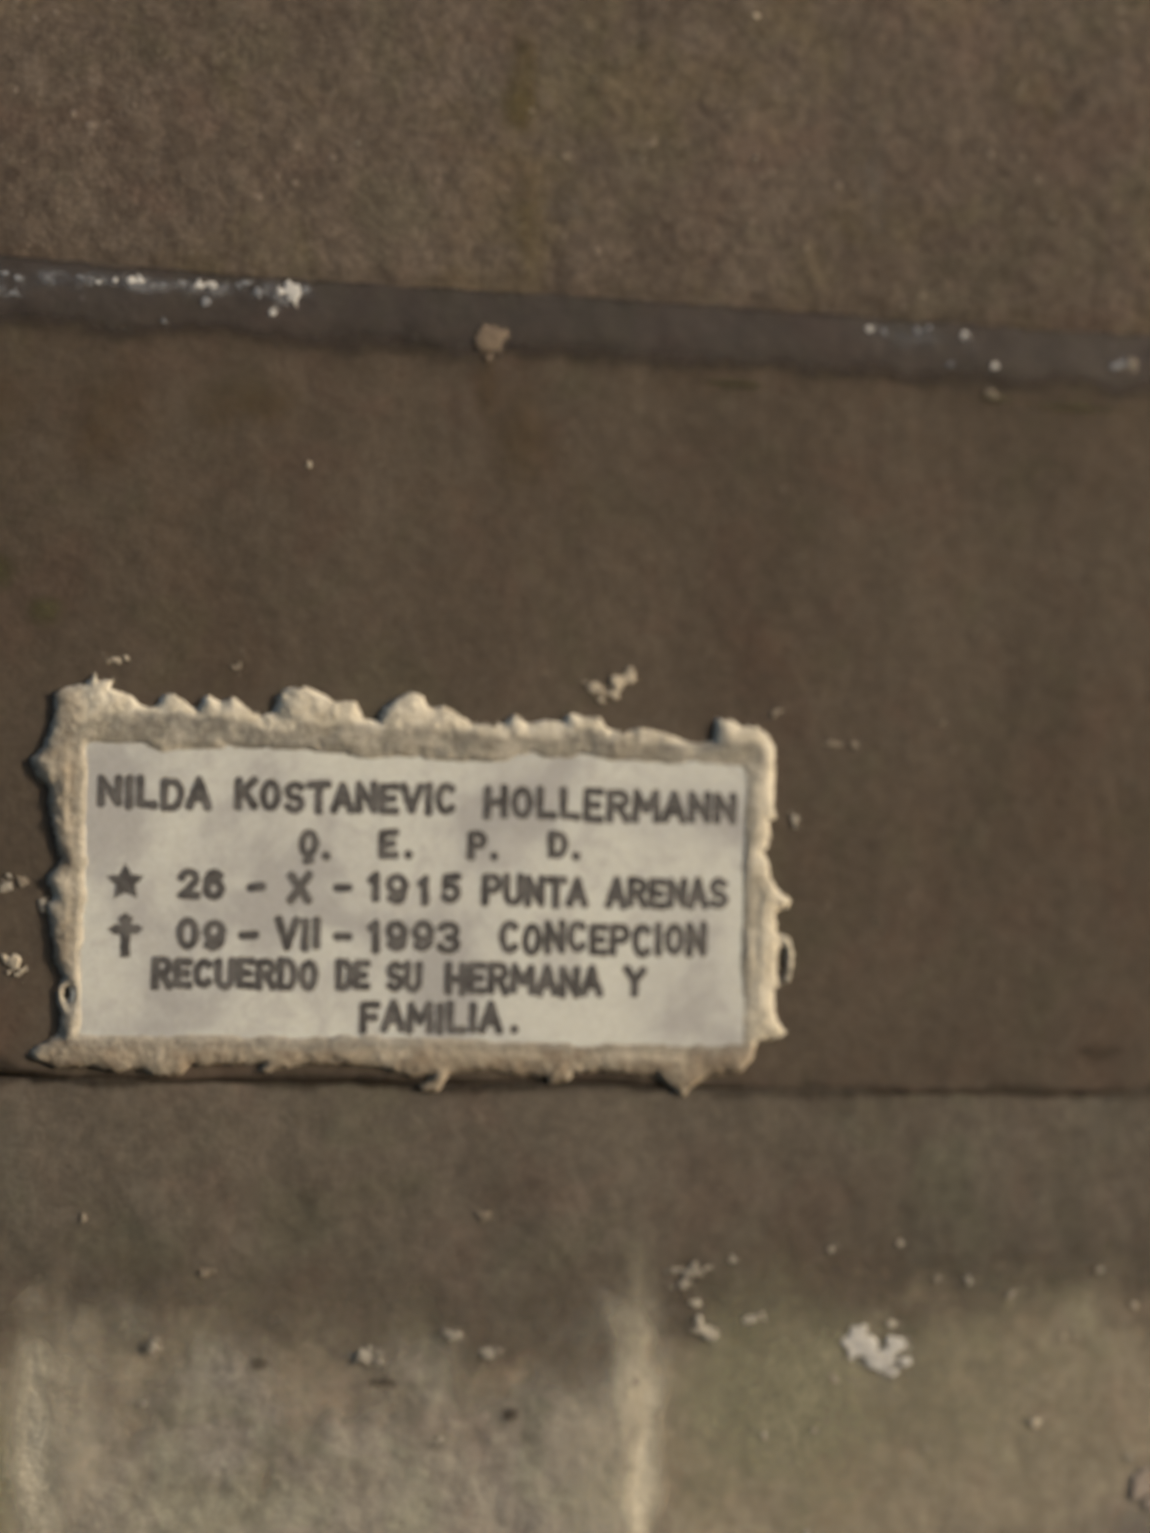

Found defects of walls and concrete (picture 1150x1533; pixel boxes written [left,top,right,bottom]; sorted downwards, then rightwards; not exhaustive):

leakage [13,1342,62,1533]
leakage [612,1312,663,1533]